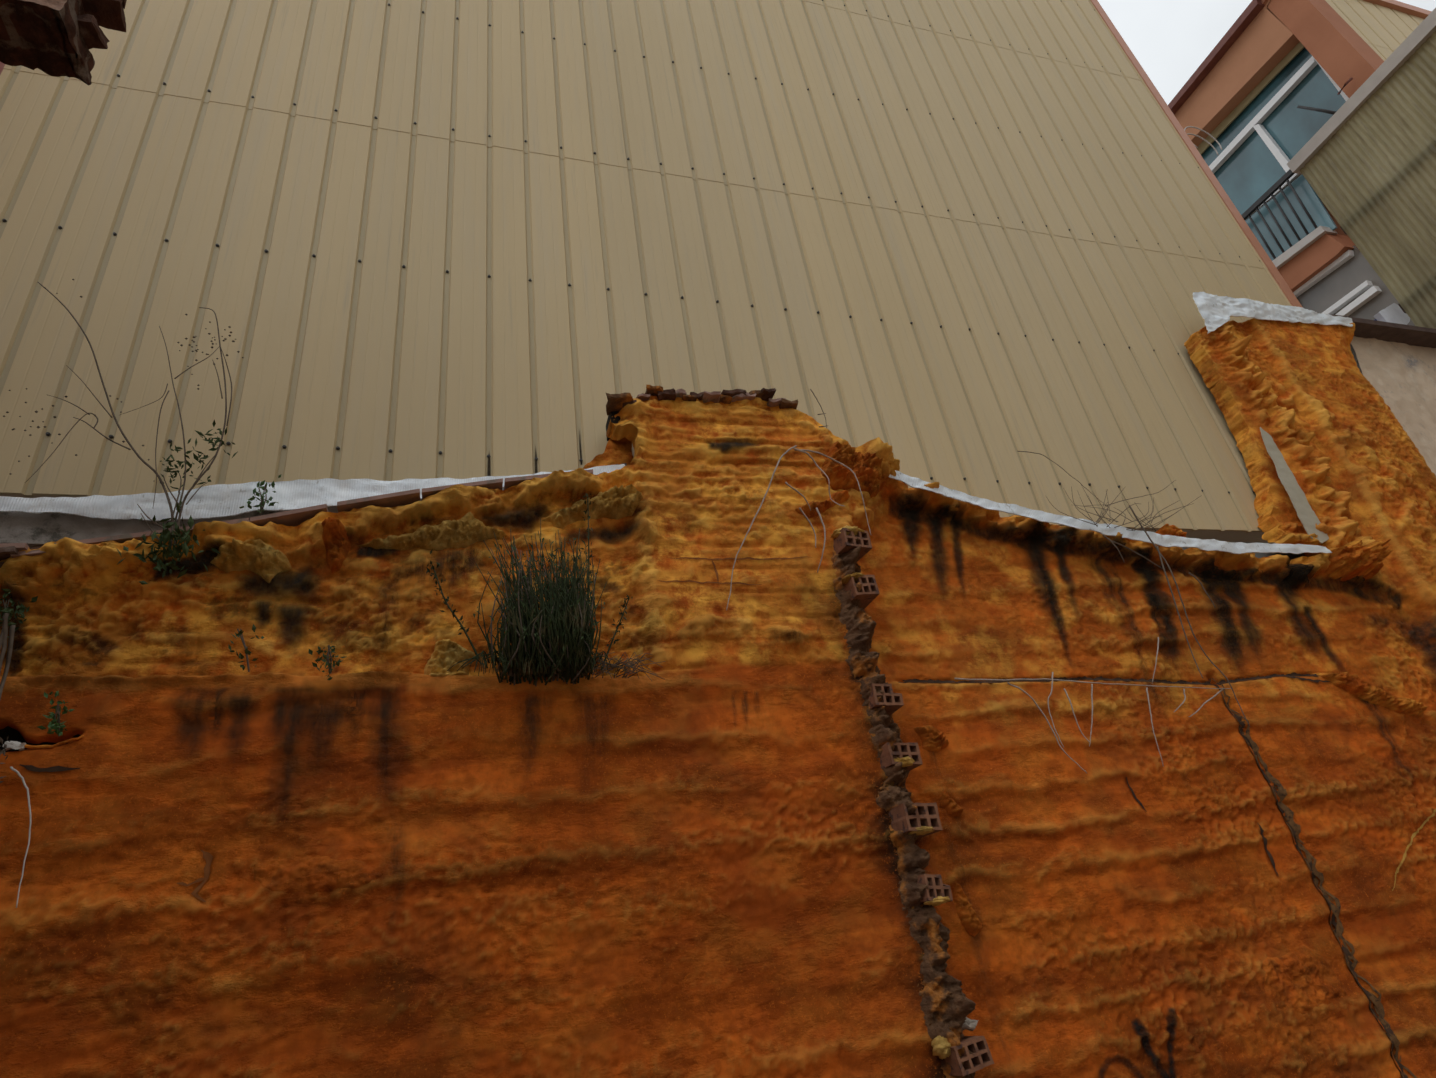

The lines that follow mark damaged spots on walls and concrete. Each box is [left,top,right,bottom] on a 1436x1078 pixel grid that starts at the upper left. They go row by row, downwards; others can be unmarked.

spalling [77,0,127,49]
damp [890,494,1402,663]
damp [179,691,251,744]
spalling [2,741,26,751]
crack [899,672,1417,1078]